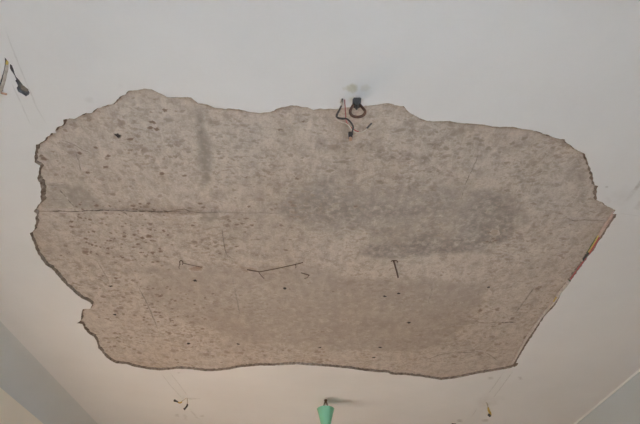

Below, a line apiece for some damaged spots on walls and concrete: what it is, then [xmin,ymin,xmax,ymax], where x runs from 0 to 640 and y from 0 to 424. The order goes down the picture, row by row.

crack [40,184,274,216]
flaking render [30,89,616,380]